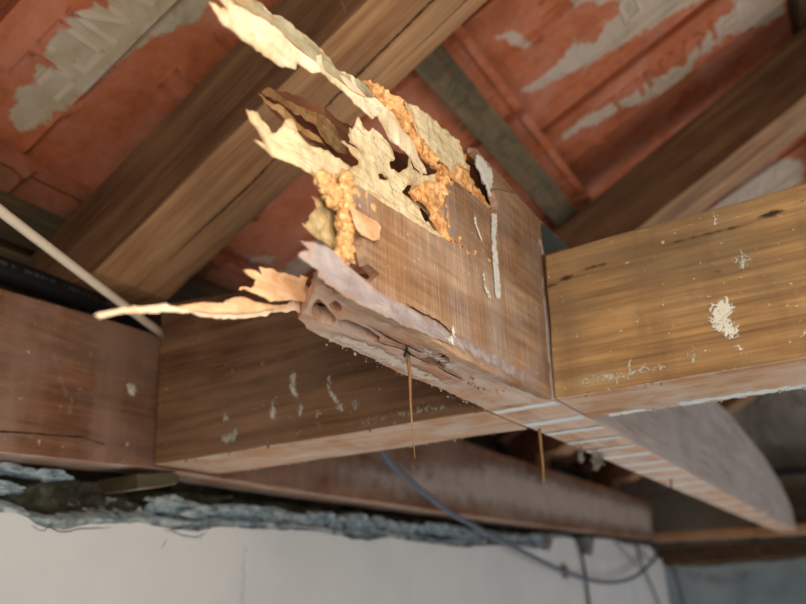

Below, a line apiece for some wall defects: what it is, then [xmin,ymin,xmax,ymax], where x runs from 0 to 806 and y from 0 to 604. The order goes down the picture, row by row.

peeling [350,205,381,241]
peeling [239,267,322,303]
peeling [298,241,452,345]
crack [0,430,111,446]
flaking render [0,462,649,555]